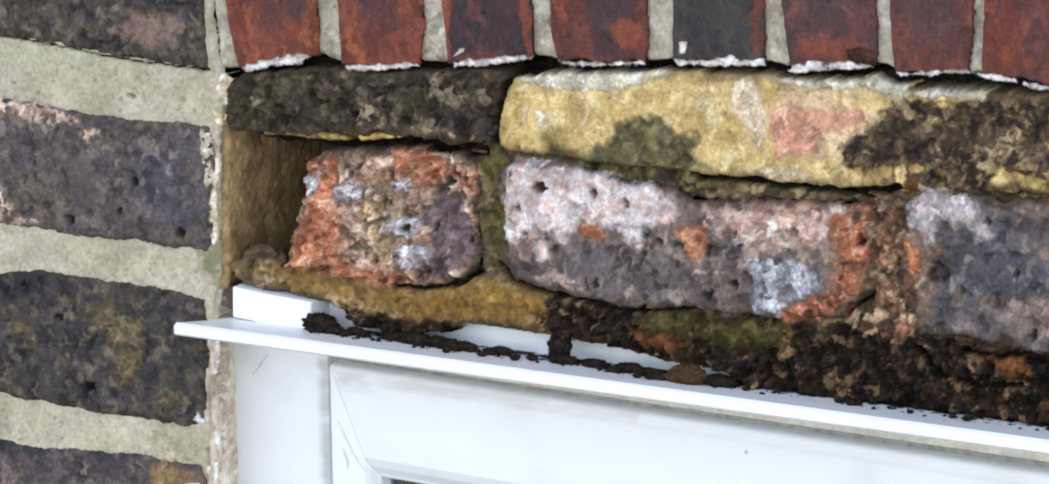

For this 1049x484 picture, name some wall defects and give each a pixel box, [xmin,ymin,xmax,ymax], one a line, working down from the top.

spalling [344,309,465,333]
spalling [503,158,1049,425]